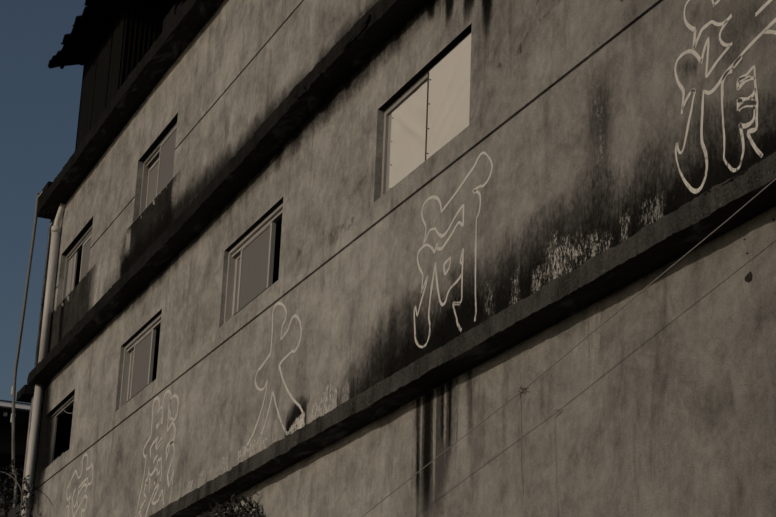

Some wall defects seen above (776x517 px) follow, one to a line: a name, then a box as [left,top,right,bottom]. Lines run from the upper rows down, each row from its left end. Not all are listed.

damp [92,0,453,339]
damp [416,370,473,501]
damp [463,0,492,30]
damp [217,105,776,476]